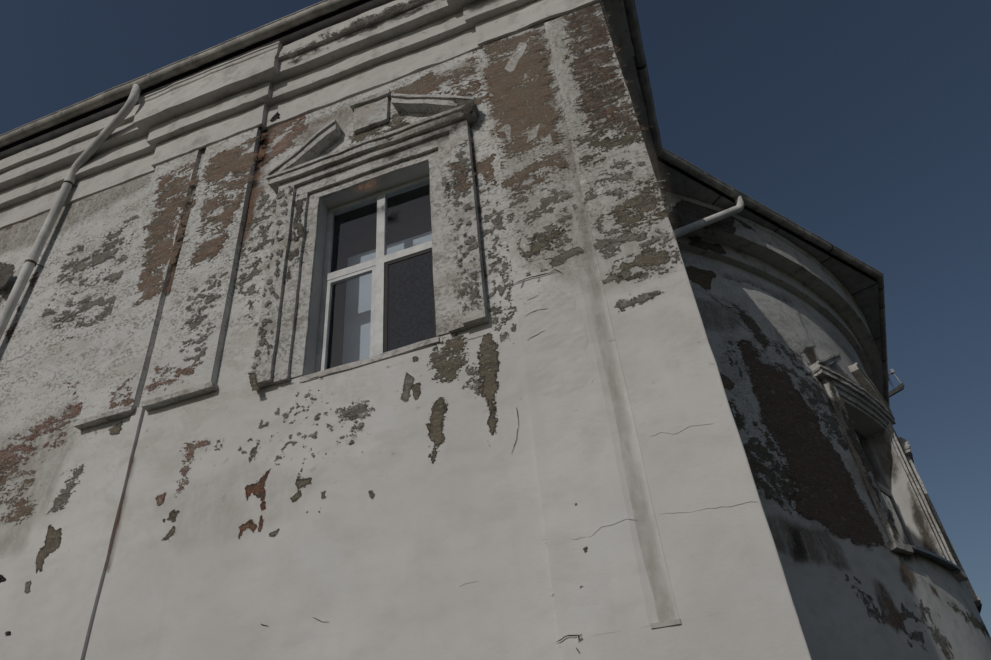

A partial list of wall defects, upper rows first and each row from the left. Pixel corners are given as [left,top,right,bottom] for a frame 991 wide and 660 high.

peeling [39,116,314,409]
peeling [391,2,756,435]
peeling [0,368,84,593]
peeling [155,438,224,540]
peeling [238,390,375,539]
peeling [425,396,448,463]
crack [661,501,752,514]
spalling [719,304,905,551]
peeling [845,574,885,625]
peeling [899,600,953,660]
peeling [948,602,989,637]